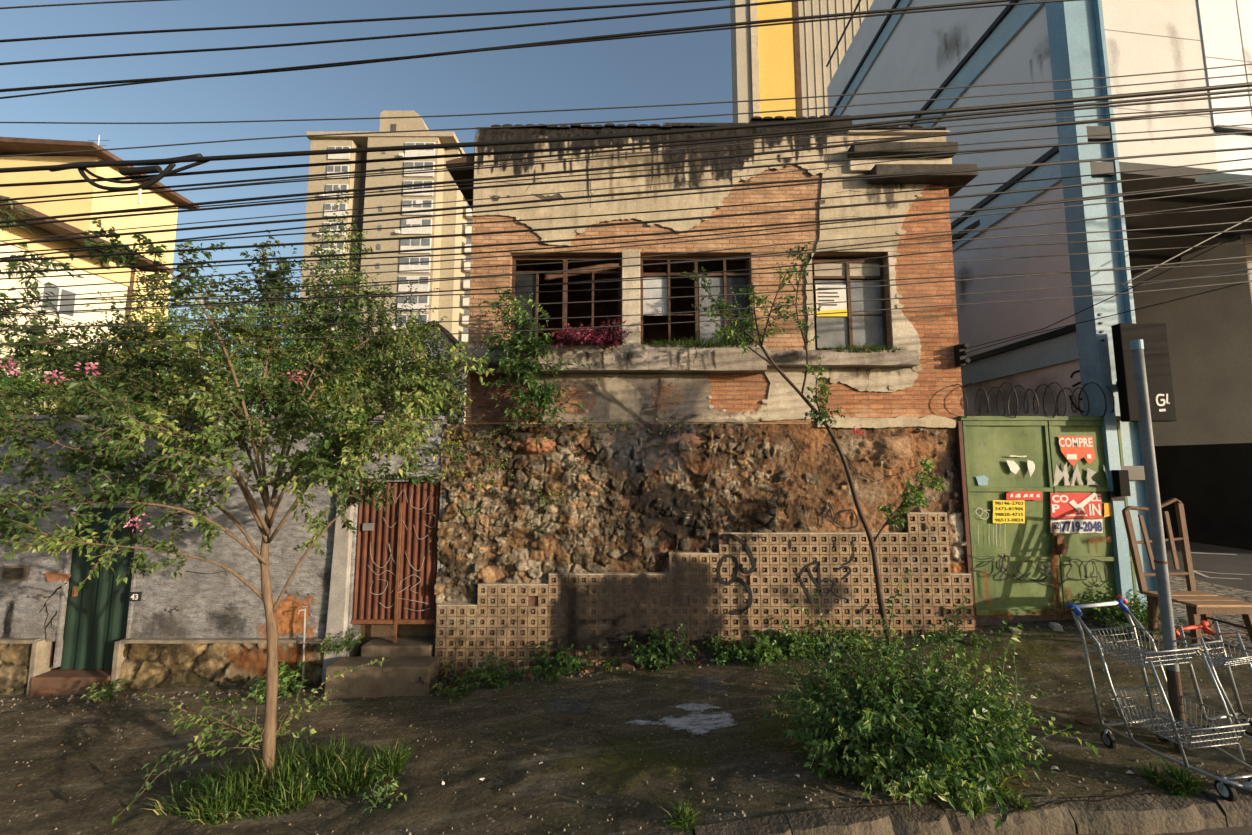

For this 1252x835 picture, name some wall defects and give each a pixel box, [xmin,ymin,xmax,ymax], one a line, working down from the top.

damp [476,120,828,195]
damp [871,184,904,206]
flaking render [468,161,825,350]
flaking render [470,373,642,423]
flaking render [701,373,769,422]
damp [626,519,634,560]
damp [558,572,566,605]
peeling [259,589,319,638]